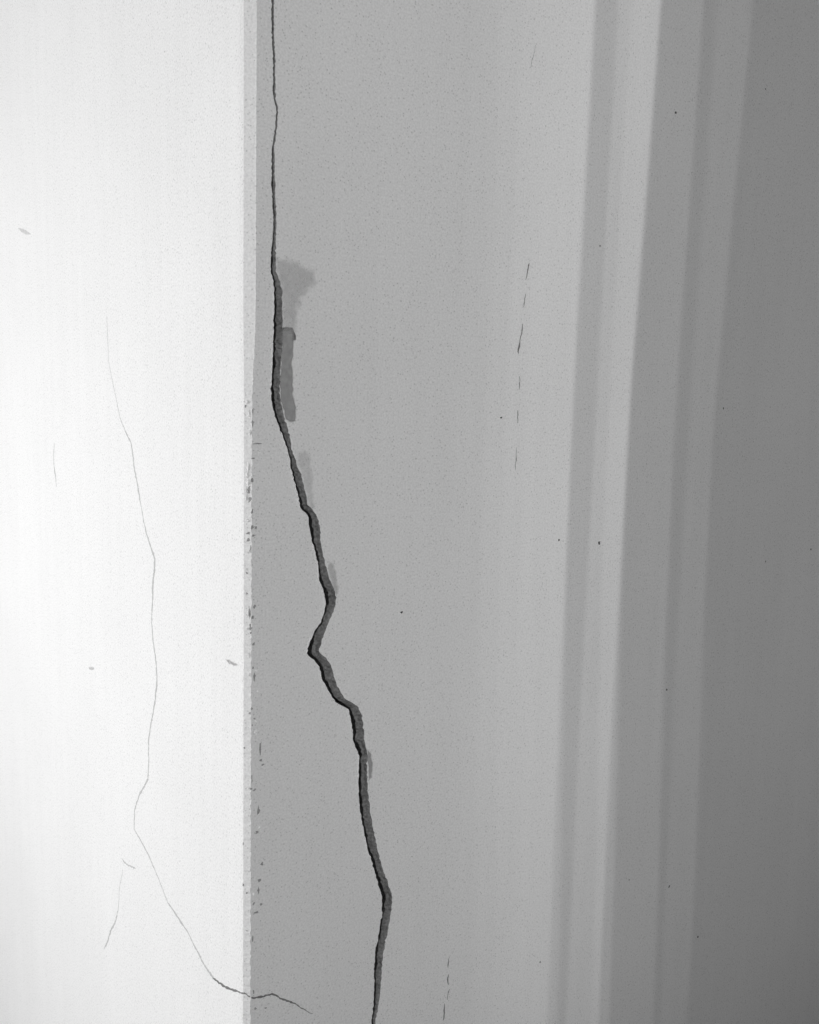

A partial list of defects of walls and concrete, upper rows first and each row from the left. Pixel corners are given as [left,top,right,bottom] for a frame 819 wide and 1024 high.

crack [104,328,312,1014]
crack [269,0,392,1024]